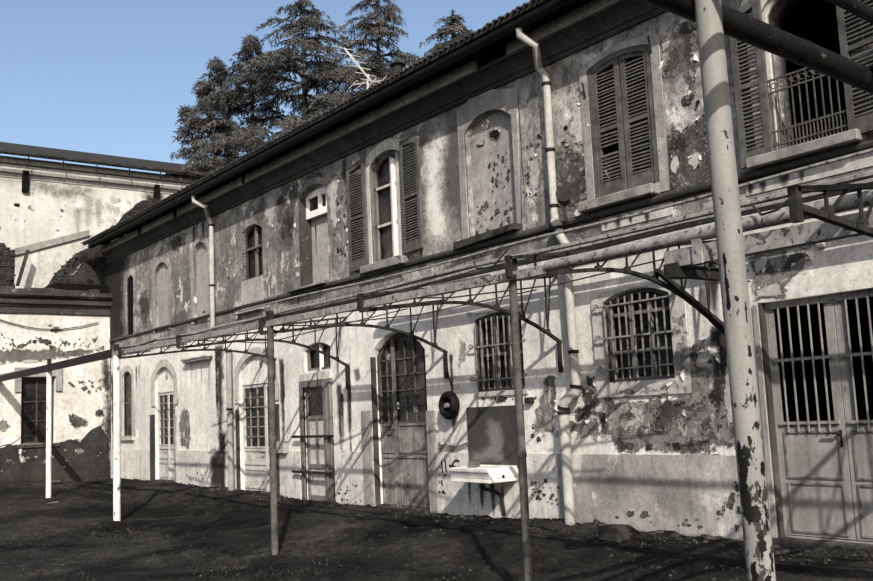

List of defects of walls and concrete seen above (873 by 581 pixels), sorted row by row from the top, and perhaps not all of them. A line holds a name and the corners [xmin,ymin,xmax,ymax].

peeling [659,21,711,193]
peeling [475,151,512,235]
peeling [525,135,542,197]
peeling [555,101,591,215]
peeling [748,244,815,300]
peeling [0,325,104,365]
water stain [210,346,226,487]
peeling [530,375,558,442]
peeling [569,314,774,581]
peeling [530,479,560,505]